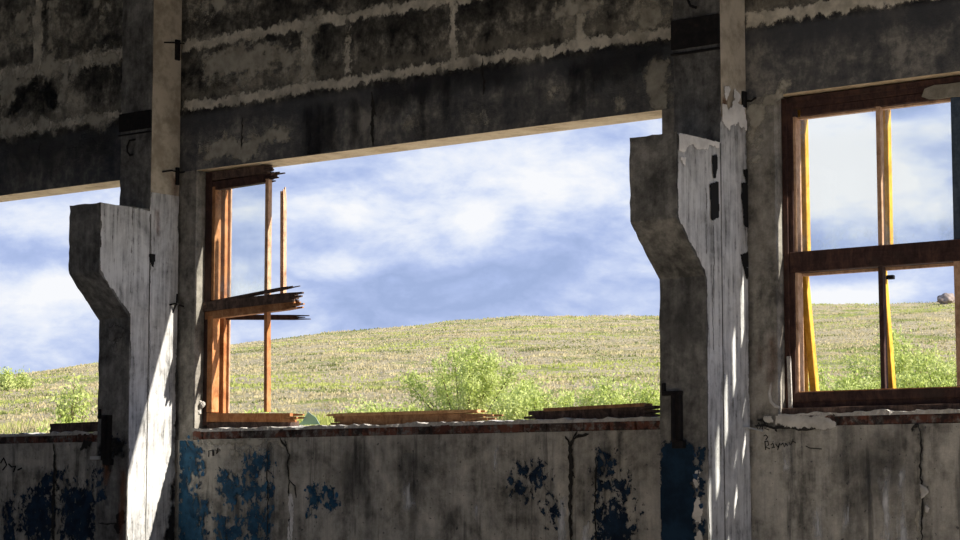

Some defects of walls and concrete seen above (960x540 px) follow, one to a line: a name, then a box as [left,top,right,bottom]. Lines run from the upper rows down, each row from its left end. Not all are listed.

leakage [644,58,671,110]
spalling [722,86,747,131]
spalling [679,133,720,220]
spalling [741,251,749,279]
spalling [763,382,836,431]
peeling [0,464,107,540]
peeling [178,435,287,540]
peeling [503,458,564,531]
crack [565,431,597,540]
peeling [588,444,644,540]
peeling [660,439,707,540]
crack [911,423,928,540]